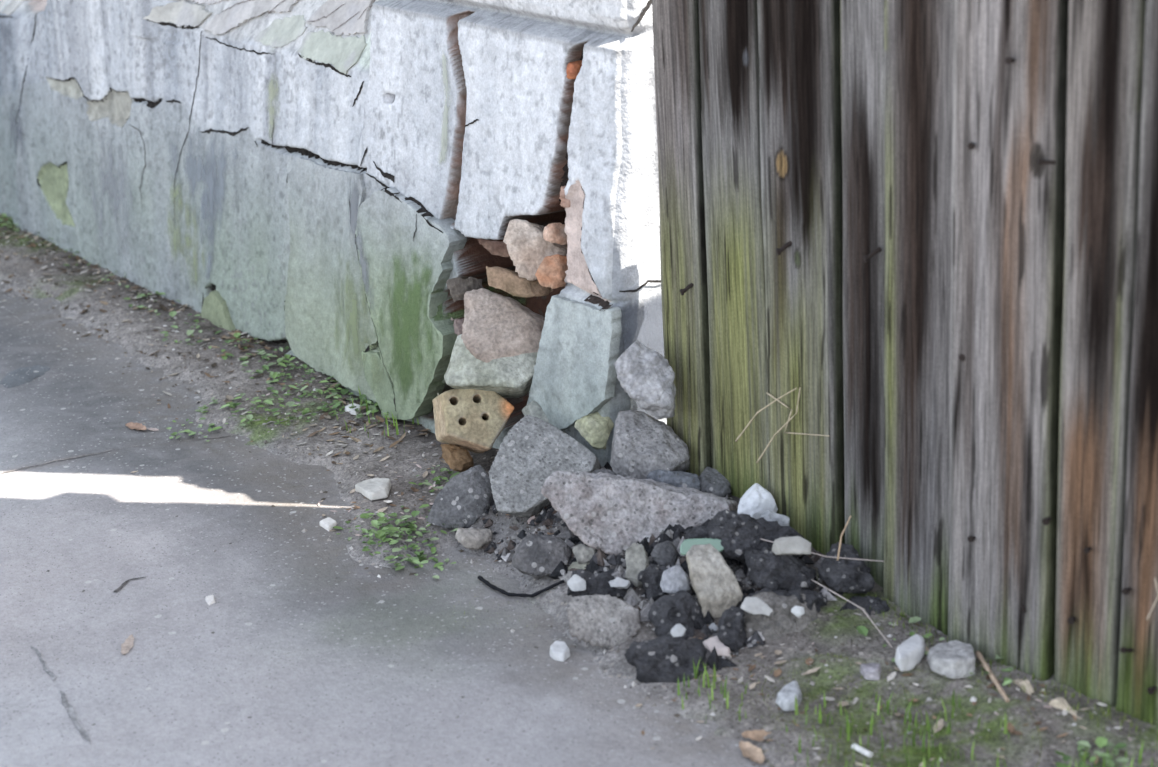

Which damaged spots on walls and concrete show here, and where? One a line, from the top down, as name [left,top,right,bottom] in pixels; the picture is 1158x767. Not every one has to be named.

peeling [143,0,375,75]
crack [566,50,583,79]
spalling [87,89,132,127]
crack [0,13,459,240]
spalling [37,162,75,226]
crack [559,136,571,208]
damp [349,186,367,292]
spalling [446,180,607,302]
spalling [451,318,464,335]
crack [30,646,91,743]